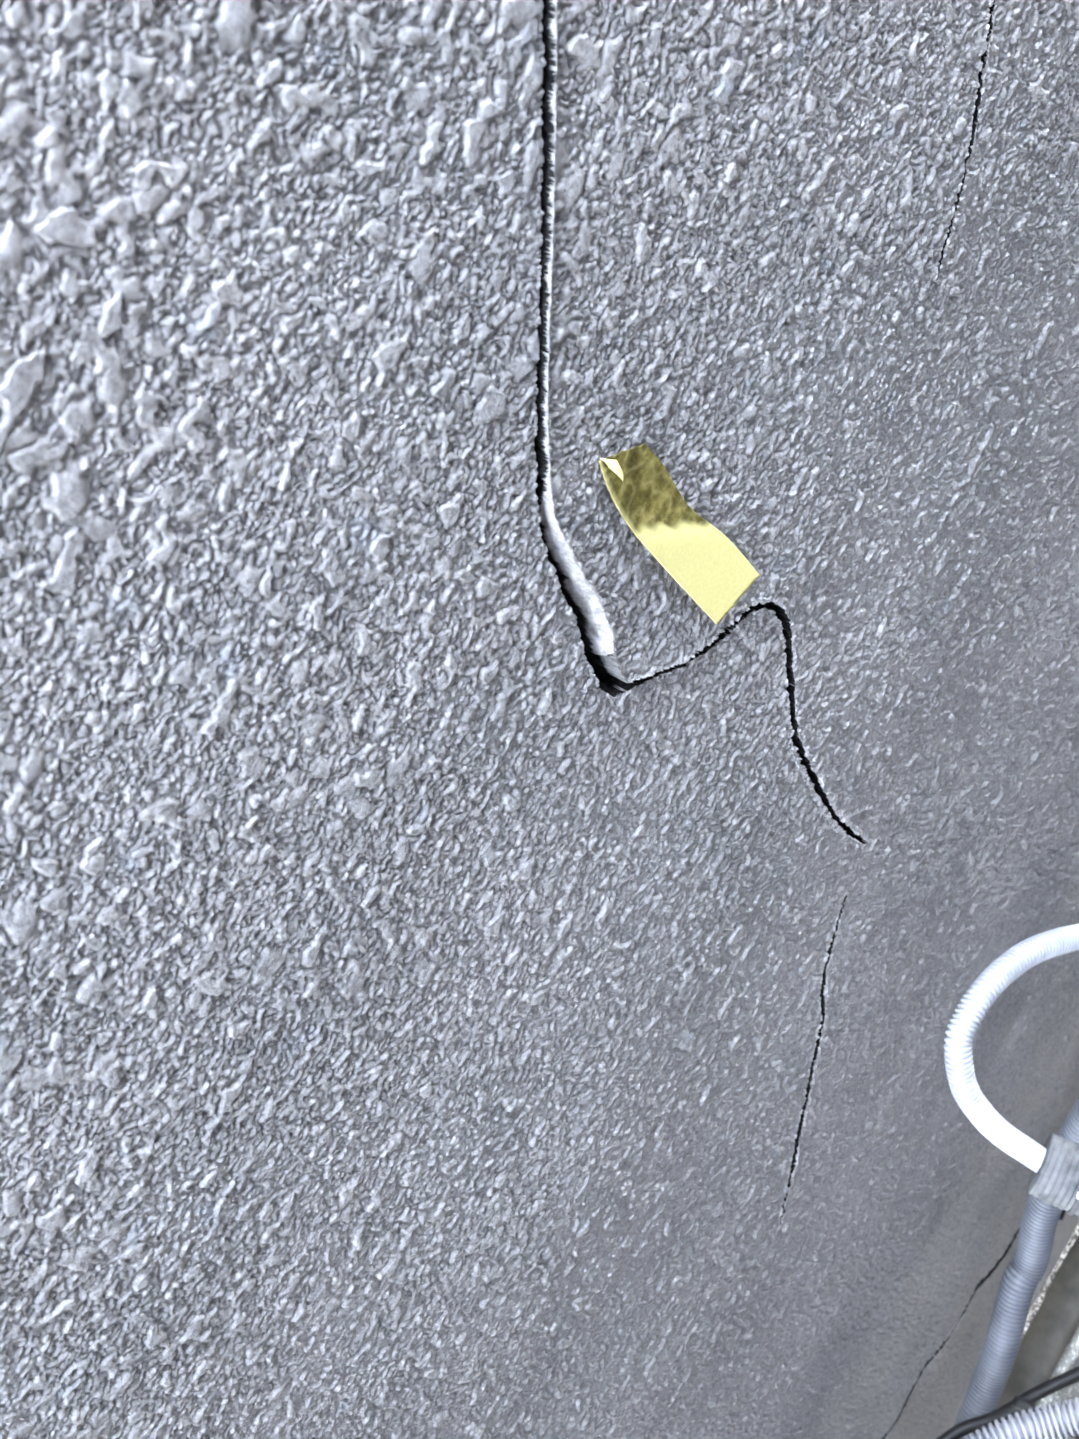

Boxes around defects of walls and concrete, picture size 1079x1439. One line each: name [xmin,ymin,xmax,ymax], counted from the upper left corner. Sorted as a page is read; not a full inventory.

crack [531,0,869,849]
crack [777,892,851,1227]
crack [880,1226,1020,1439]